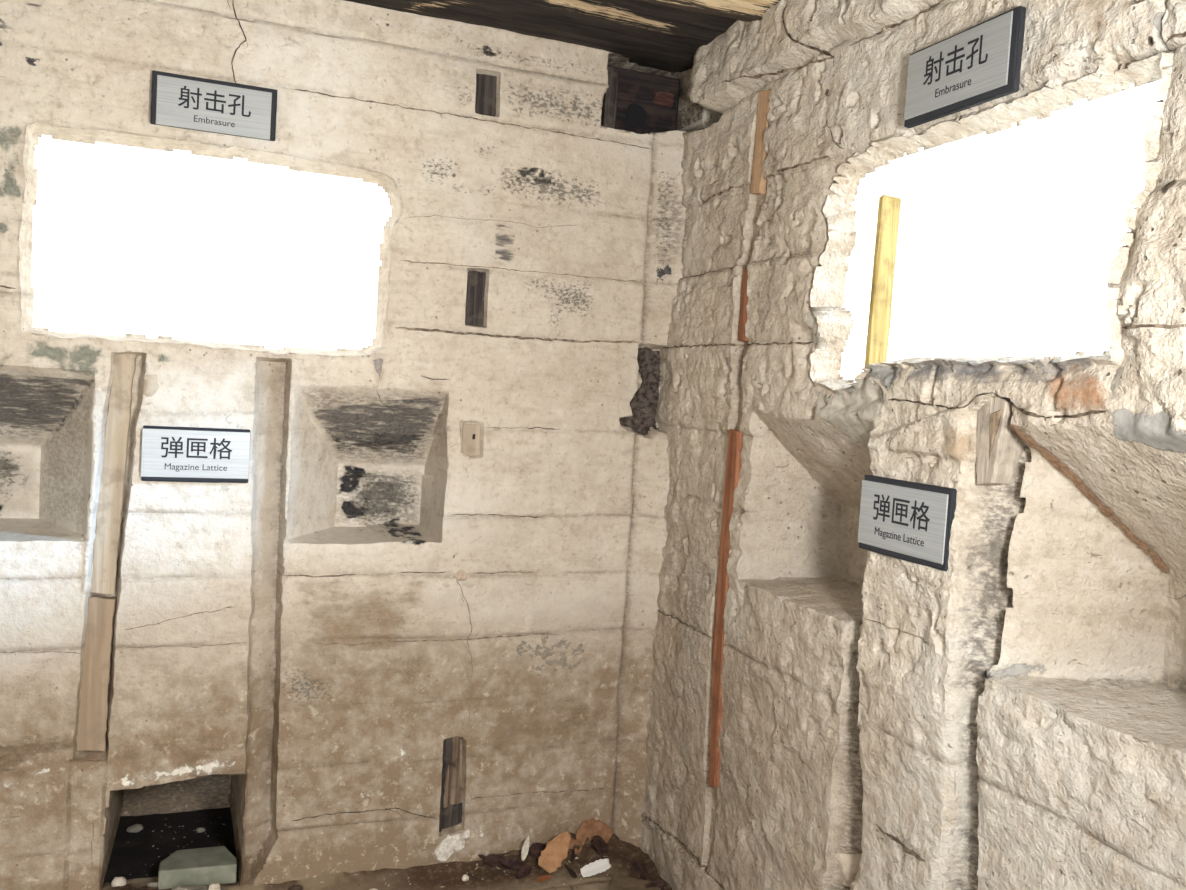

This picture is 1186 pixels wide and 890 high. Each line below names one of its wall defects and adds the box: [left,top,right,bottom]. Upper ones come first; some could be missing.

crack [227,1,248,83]
mould [504,167,599,206]
crack [888,392,1108,418]